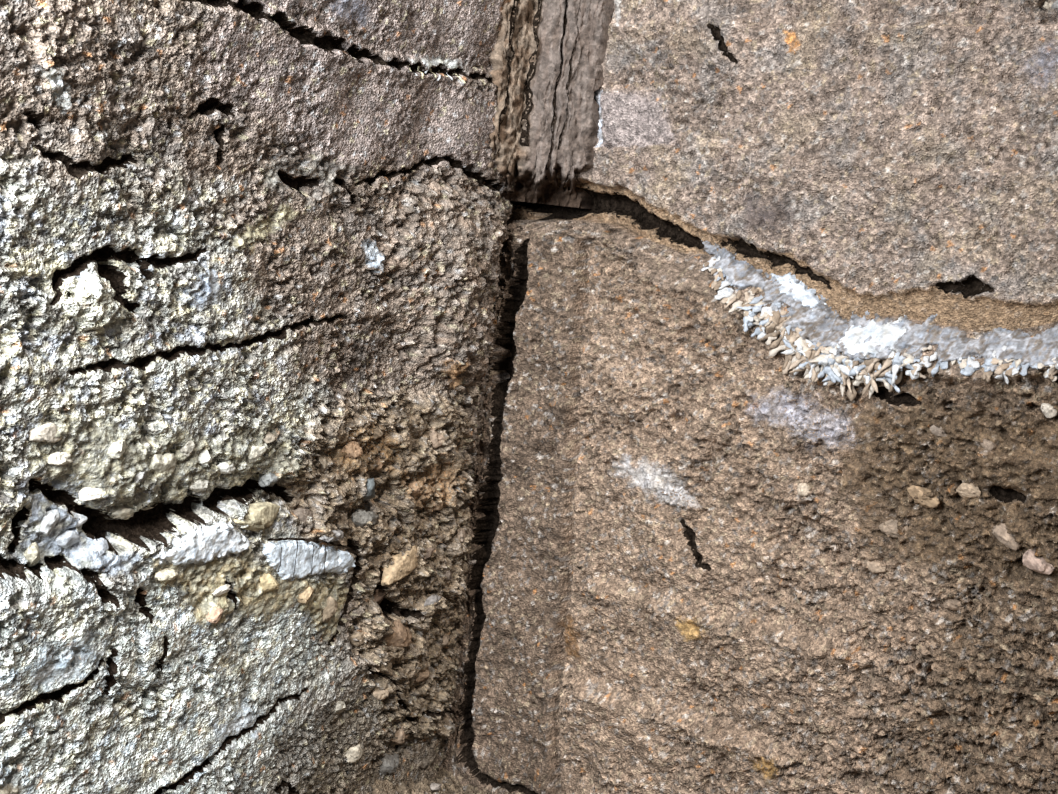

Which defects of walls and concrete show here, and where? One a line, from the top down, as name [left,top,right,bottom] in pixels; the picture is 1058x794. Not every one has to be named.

crack [34,145,138,179]
crack [50,245,207,313]
crack [70,314,347,375]
damp [701,240,1058,401]
crack [936,274,994,299]
crack [184,0,832,794]
crack [0,472,294,672]
damp [152,522,356,581]
crack [0,648,118,724]
crack [154,687,309,794]